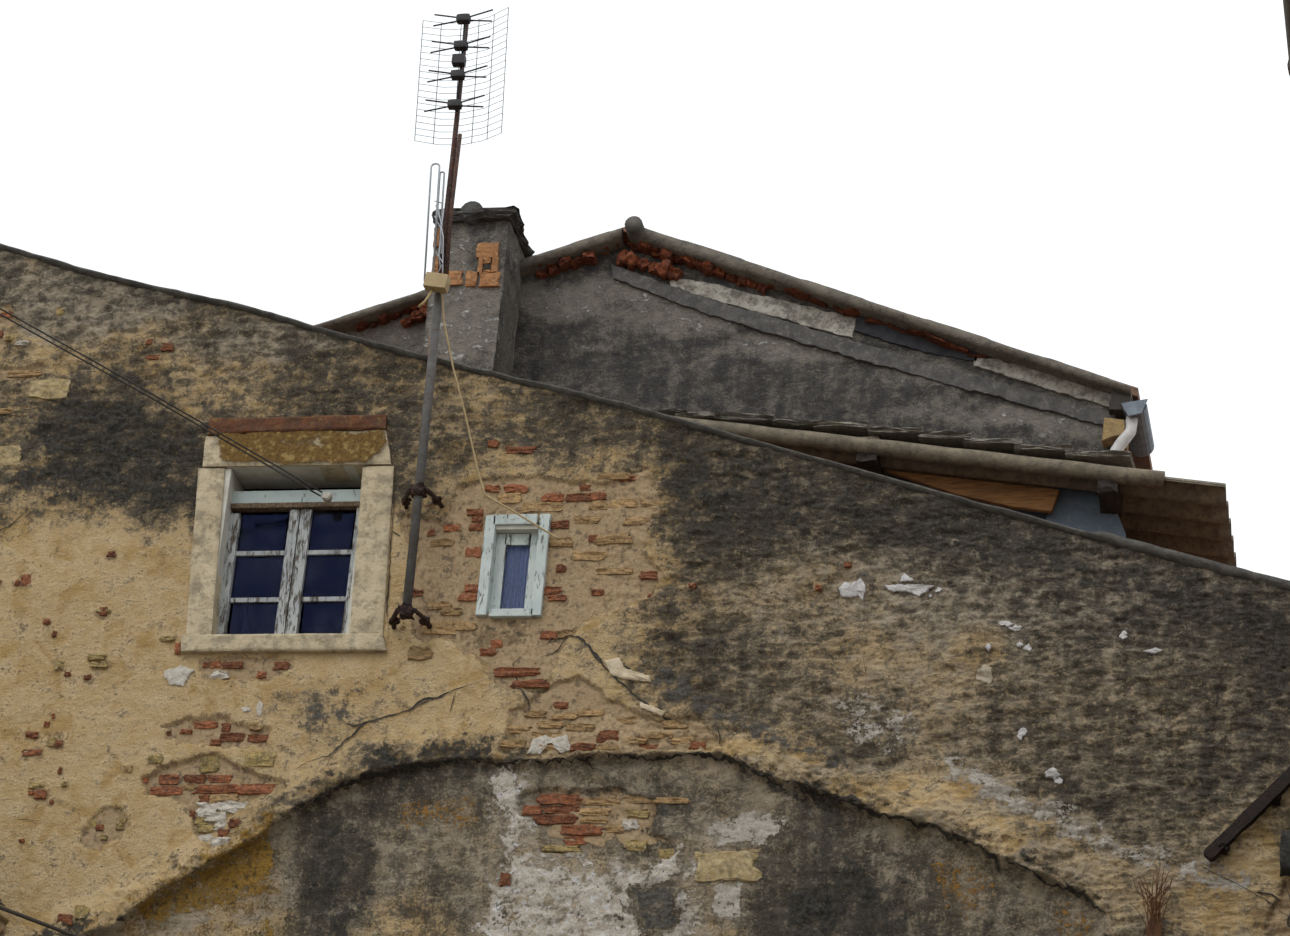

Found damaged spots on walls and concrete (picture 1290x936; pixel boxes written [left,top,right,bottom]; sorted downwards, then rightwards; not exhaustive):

leakage [2,389,203,521]
flaking render [488,439,538,454]
flaking render [813,562,866,600]
flaking render [884,573,942,598]
leakage [28,909,125,936]
flaking render [120,701,277,847]
leakage [291,802,376,936]
flaking render [395,465,788,936]
crack [284,626,1109,936]
leakage [724,754,868,808]
leakage [826,691,925,756]
leakage [934,745,1254,905]